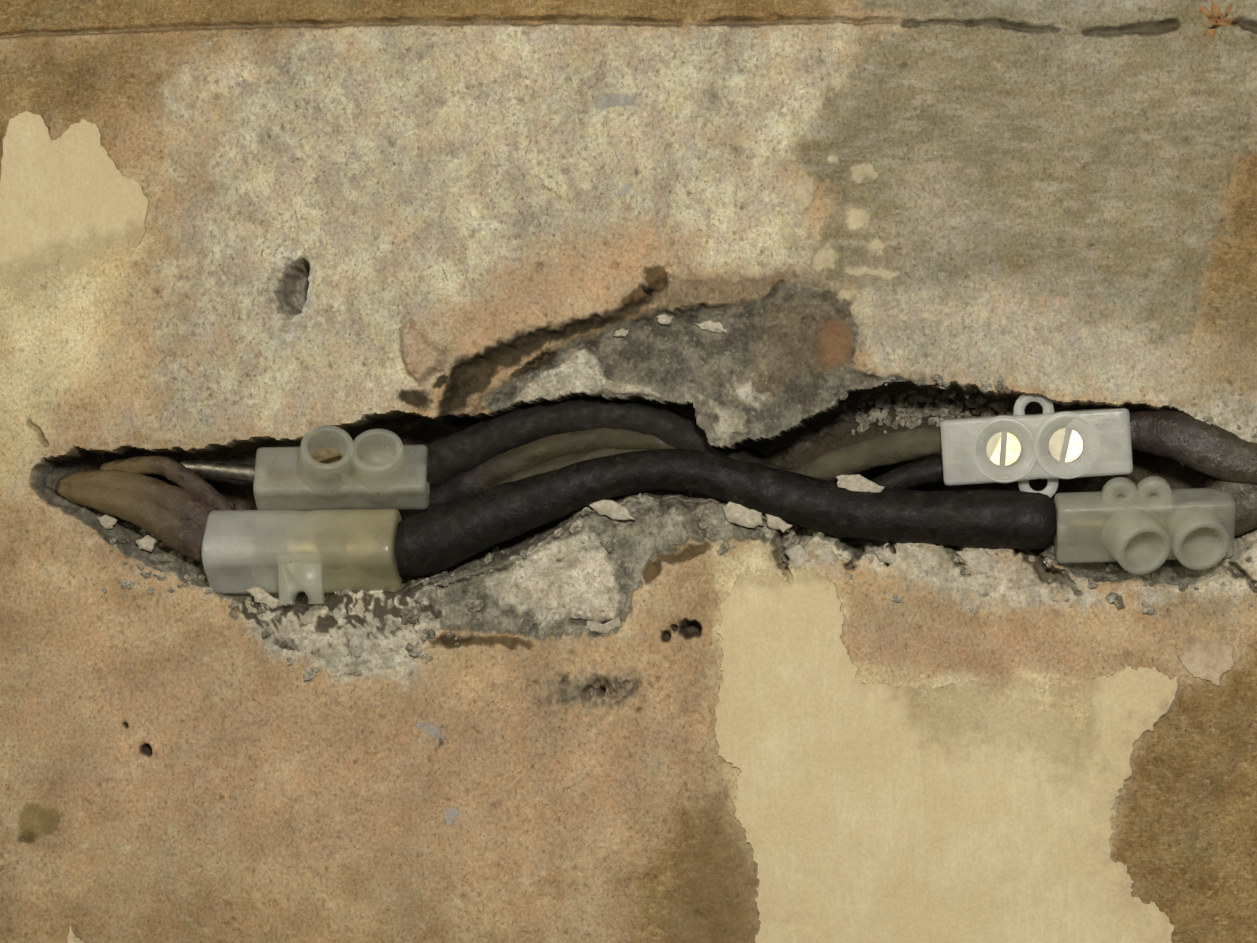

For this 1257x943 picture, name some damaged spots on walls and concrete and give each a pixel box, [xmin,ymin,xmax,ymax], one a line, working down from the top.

crack [0,13,1181,39]
crack [1235,16,1257,34]
peeling [827,155,878,184]
peeling [0,111,148,283]
peeling [29,208,1257,943]